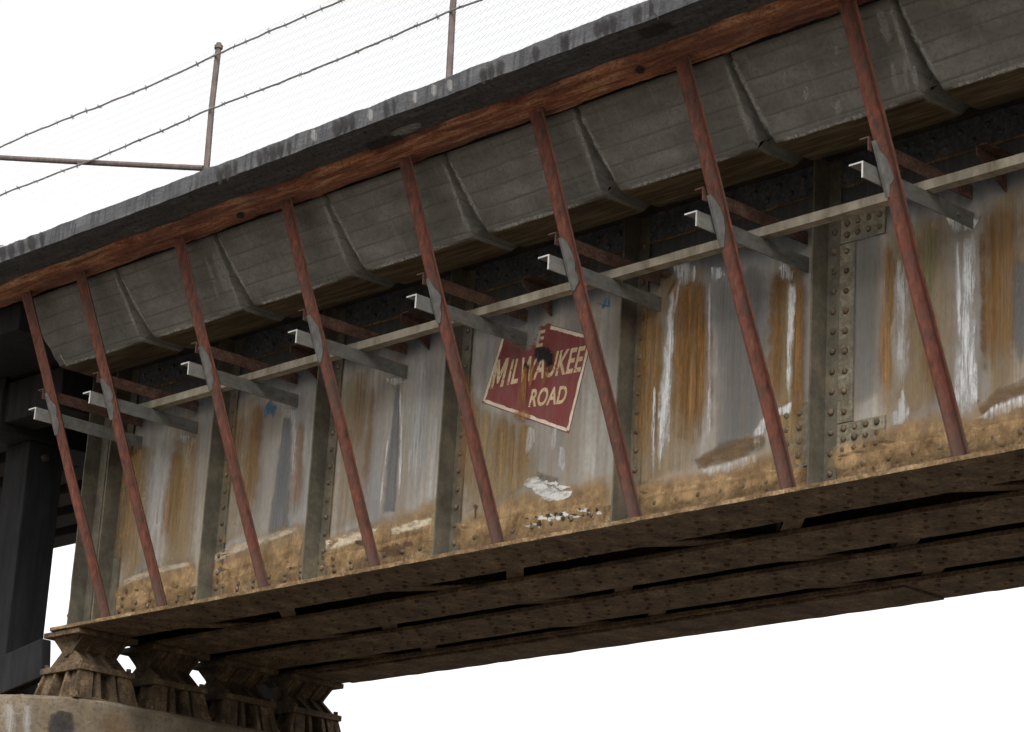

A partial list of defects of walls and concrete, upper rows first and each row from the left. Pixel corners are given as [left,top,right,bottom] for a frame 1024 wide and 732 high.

corrosion [115,447,195,611]
corrosion [457,347,607,544]
peeling [523,477,601,528]
corrosion [636,269,778,510]
corrosion [769,266,803,479]
corrosion [879,246,894,390]
corrosion [833,417,948,469]
corrosion [961,379,1024,445]